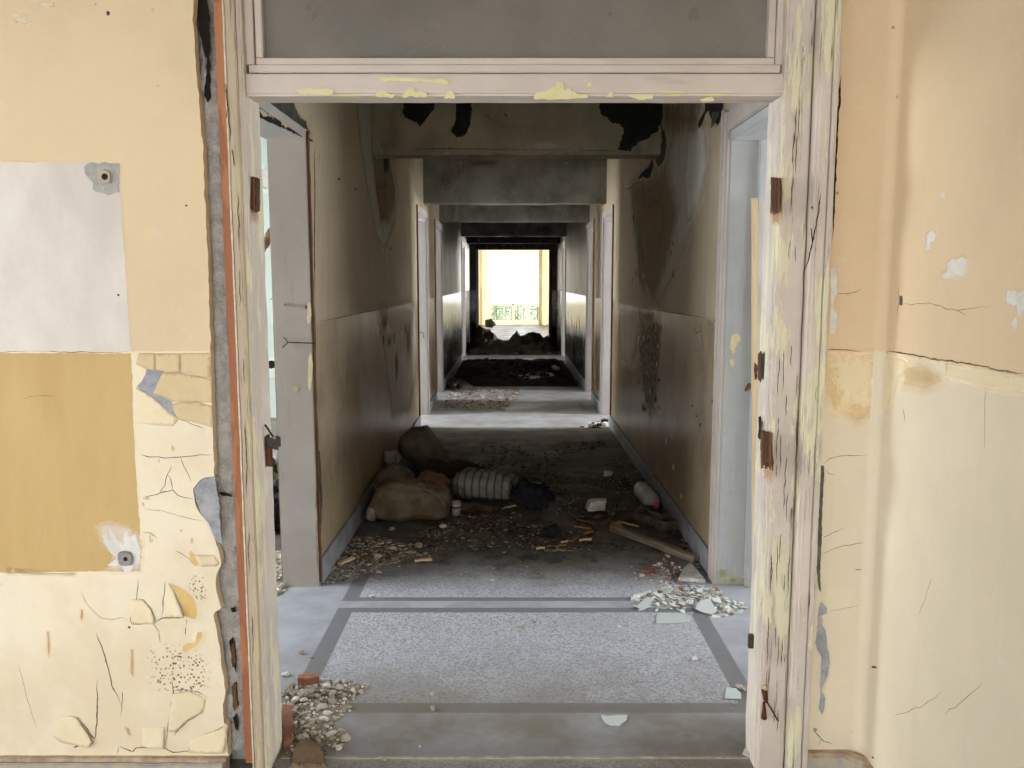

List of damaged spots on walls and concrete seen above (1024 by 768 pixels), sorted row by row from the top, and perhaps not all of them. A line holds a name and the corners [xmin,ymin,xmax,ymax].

spalling [374,76,476,140]
spalling [533,81,668,181]
peeling [0,0,245,754]
water stain [619,312,659,407]
crack [897,303,990,316]
peeling [940,253,970,281]
peeling [1005,287,1024,331]
crack [140,454,214,561]
flaking render [813,463,833,732]
crack [74,585,228,754]